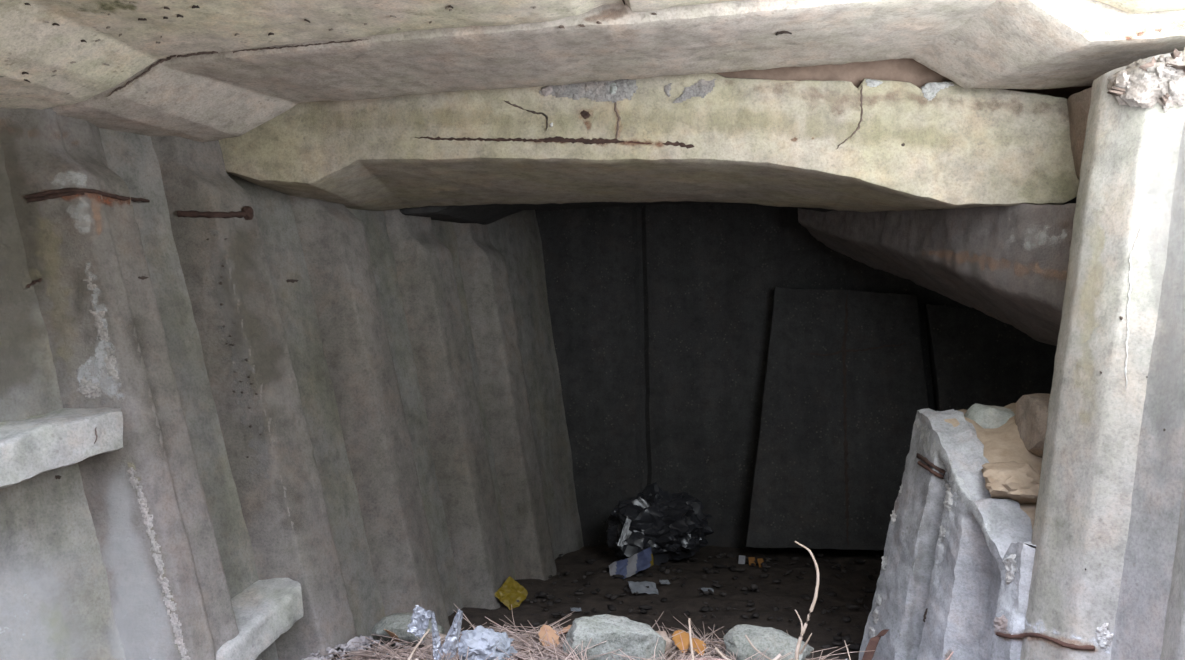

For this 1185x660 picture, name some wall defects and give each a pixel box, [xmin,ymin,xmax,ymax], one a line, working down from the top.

crack [107,39,369,97]
spalling [1107,47,1185,112]
rust [24,188,150,220]
rust [177,206,254,220]
rust [916,453,946,479]
rust [996,632,1095,650]